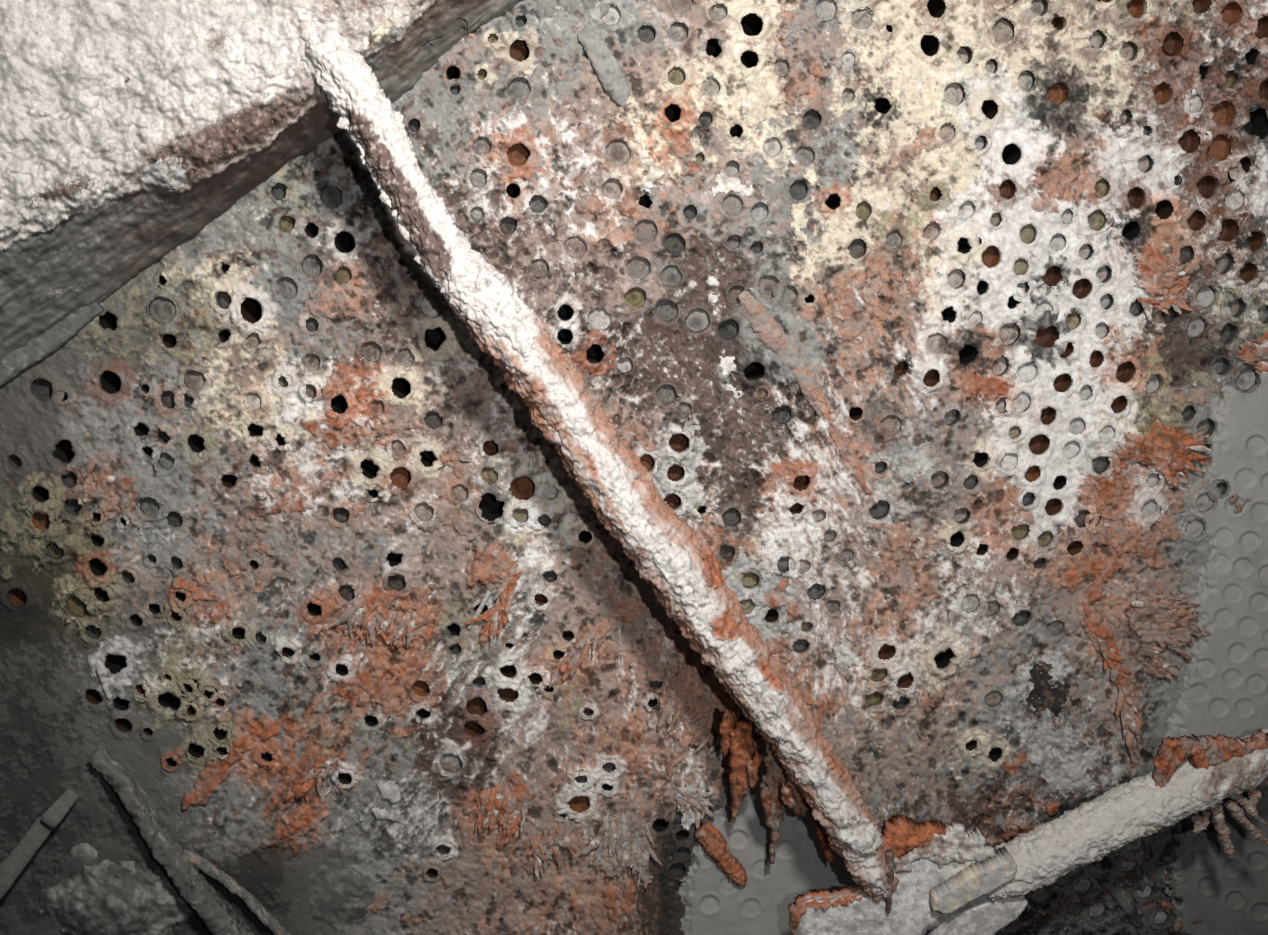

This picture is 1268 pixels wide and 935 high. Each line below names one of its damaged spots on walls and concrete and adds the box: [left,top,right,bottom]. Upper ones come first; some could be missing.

water stain [667,238,753,322]
rust [1110,241,1194,358]
water stain [1140,393,1176,425]
rust [327,583,440,655]
rust [464,539,523,647]
rust [547,593,647,688]
rust [1059,415,1268,788]
rust [754,636,850,783]
rust [181,710,310,810]
rust [274,744,373,842]
rust [468,770,574,881]
rust [880,814,946,858]